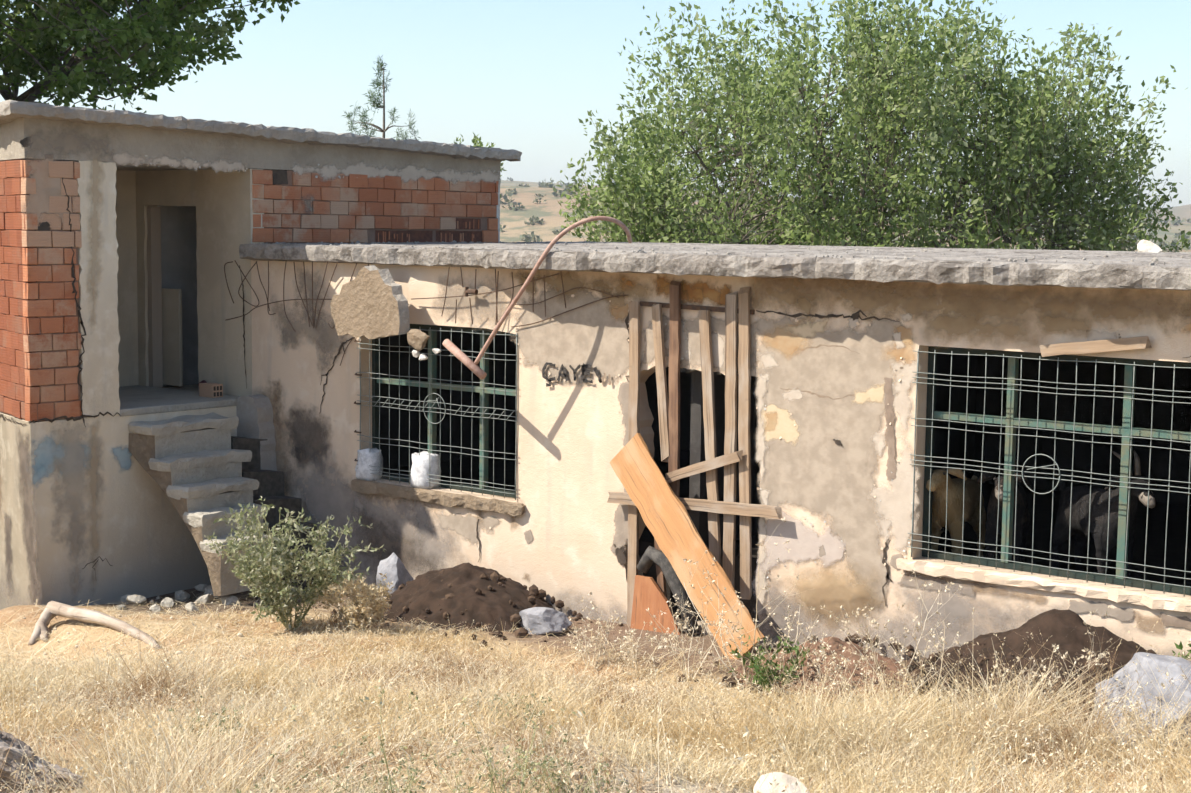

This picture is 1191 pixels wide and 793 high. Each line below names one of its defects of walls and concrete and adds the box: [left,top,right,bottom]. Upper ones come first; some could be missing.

damp [0,427,102,605]
crack [0,178,120,427]
crack [319,337,355,414]
damp [264,393,452,574]
peeling [224,261,1045,615]
crack [756,310,899,354]
damp [753,277,1191,340]
spalling [1136,614,1164,633]